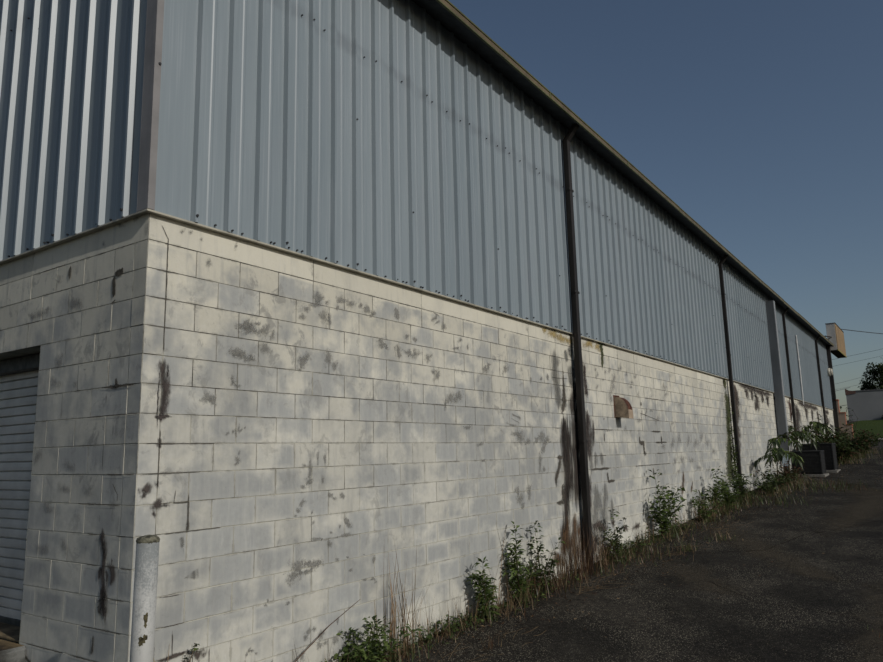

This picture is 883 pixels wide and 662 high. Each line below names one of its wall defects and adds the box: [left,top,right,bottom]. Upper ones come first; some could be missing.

damp [155,362,170,425]
damp [553,346,639,557]
damp [722,379,775,492]
damp [97,529,115,618]